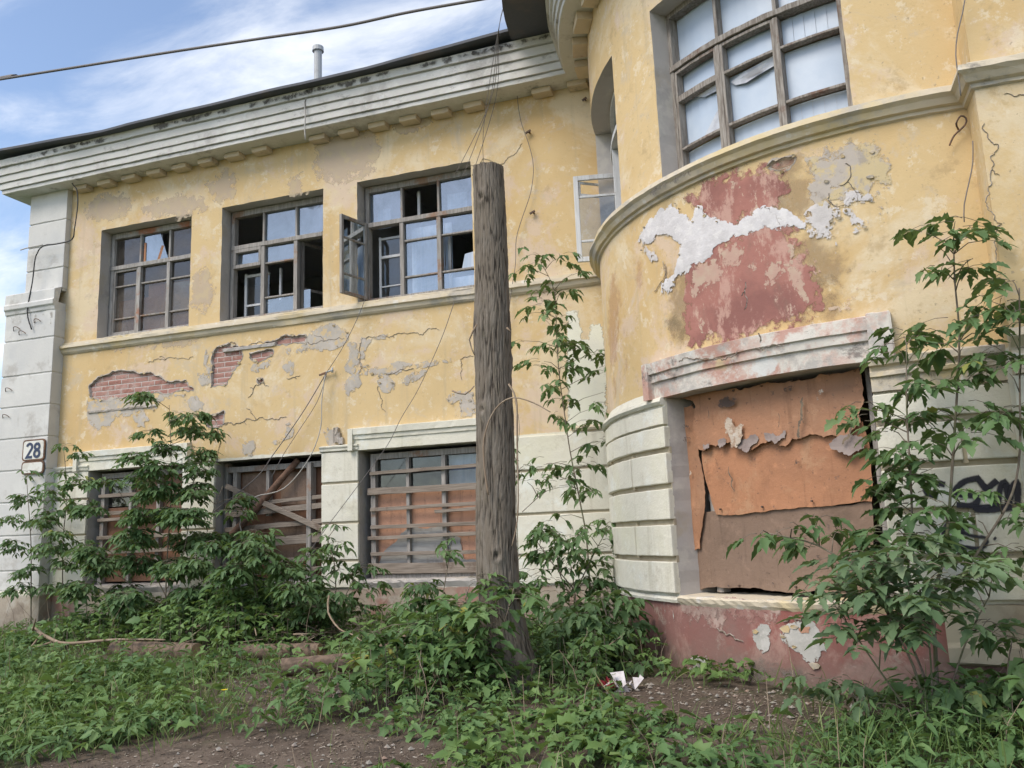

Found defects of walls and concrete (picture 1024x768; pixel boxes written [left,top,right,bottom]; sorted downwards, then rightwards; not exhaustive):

peeling [637,139,892,350]
crack [982,123,1002,262]
spalling [86,323,452,431]
peeling [446,391,476,418]
peeling [752,621,826,670]